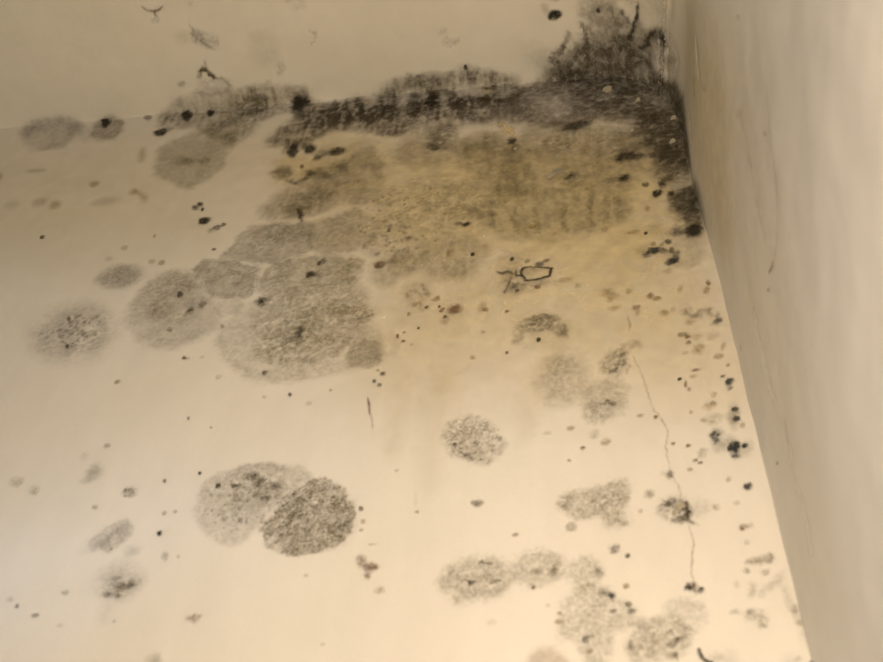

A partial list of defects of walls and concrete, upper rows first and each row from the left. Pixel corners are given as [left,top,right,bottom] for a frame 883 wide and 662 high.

leakage [153,89,277,141]
leakage [264,65,679,292]
leakage [264,294,370,353]
leakage [528,314,566,342]
leakage [231,474,363,556]
leakage [661,499,692,521]